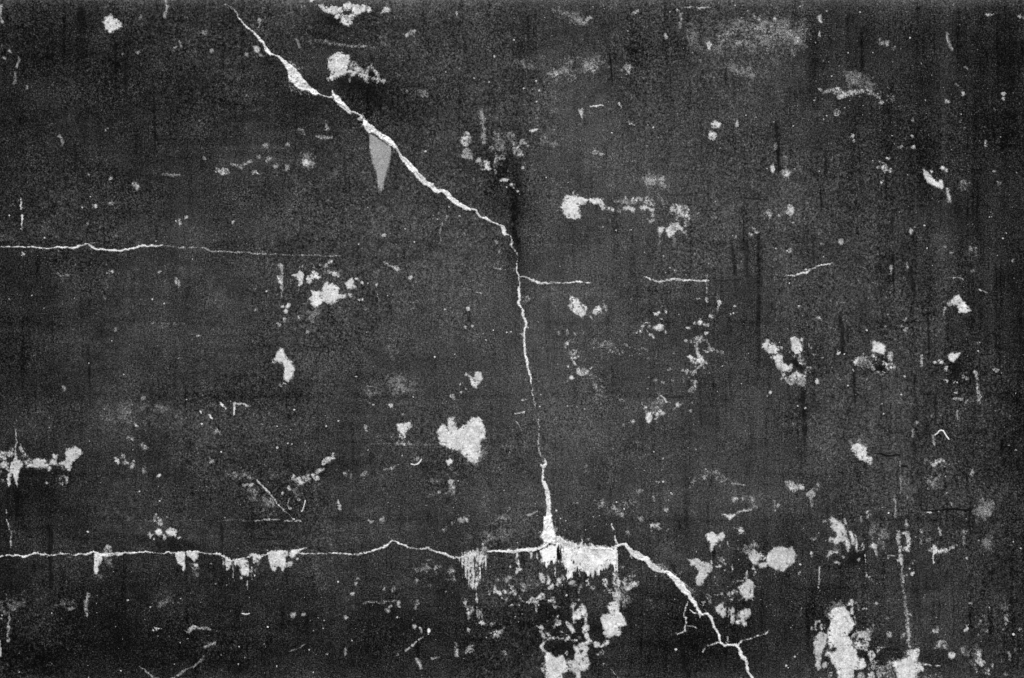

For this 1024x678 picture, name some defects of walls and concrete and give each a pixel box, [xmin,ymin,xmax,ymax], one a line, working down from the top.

crack [1,243,184,252]
crack [237,15,590,384]
spalling [561,192,690,238]
spalling [279,261,363,326]
spalling [0,443,81,486]
spalling [437,417,486,465]
crack [0,442,556,600]
crack [147,626,241,647]
spalling [489,559,638,678]
crack [611,524,768,678]
spalling [716,544,800,626]
spalling [811,599,939,678]